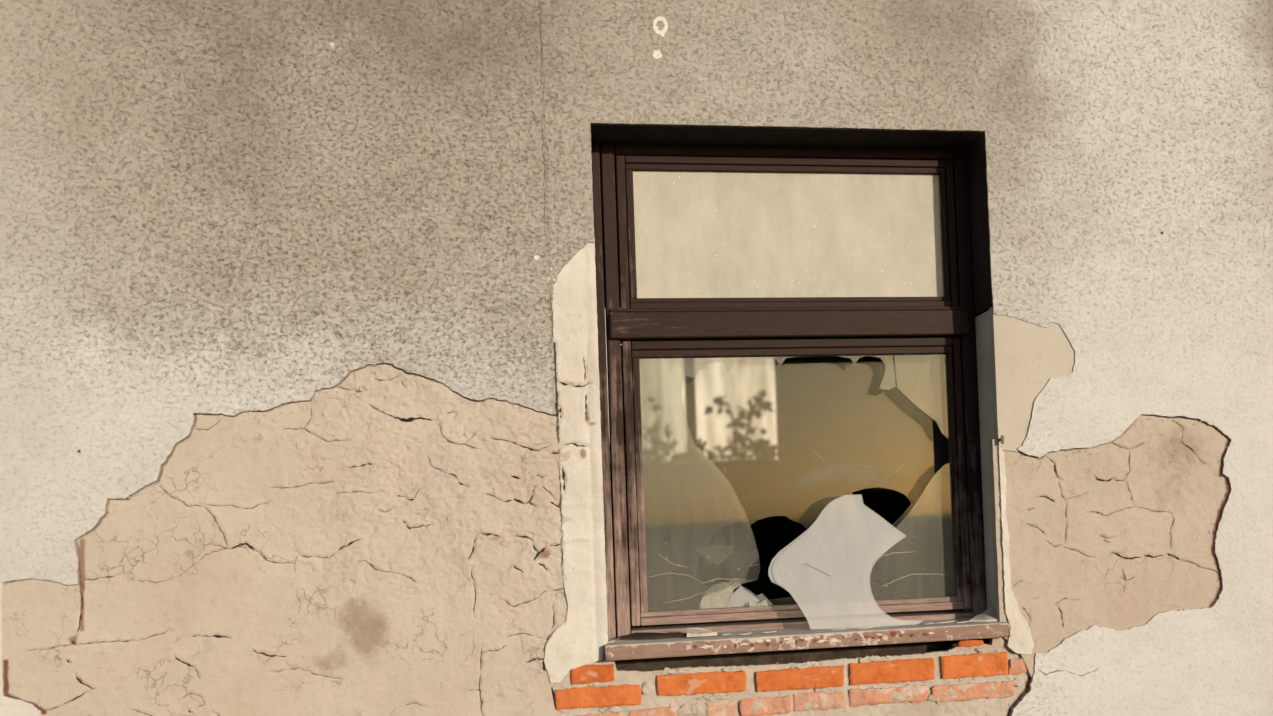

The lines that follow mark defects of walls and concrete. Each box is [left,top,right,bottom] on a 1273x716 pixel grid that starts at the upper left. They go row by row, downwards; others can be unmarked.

crack [28,292,589,716]
spalling [0,237,1228,716]
crack [1029,443,1220,593]